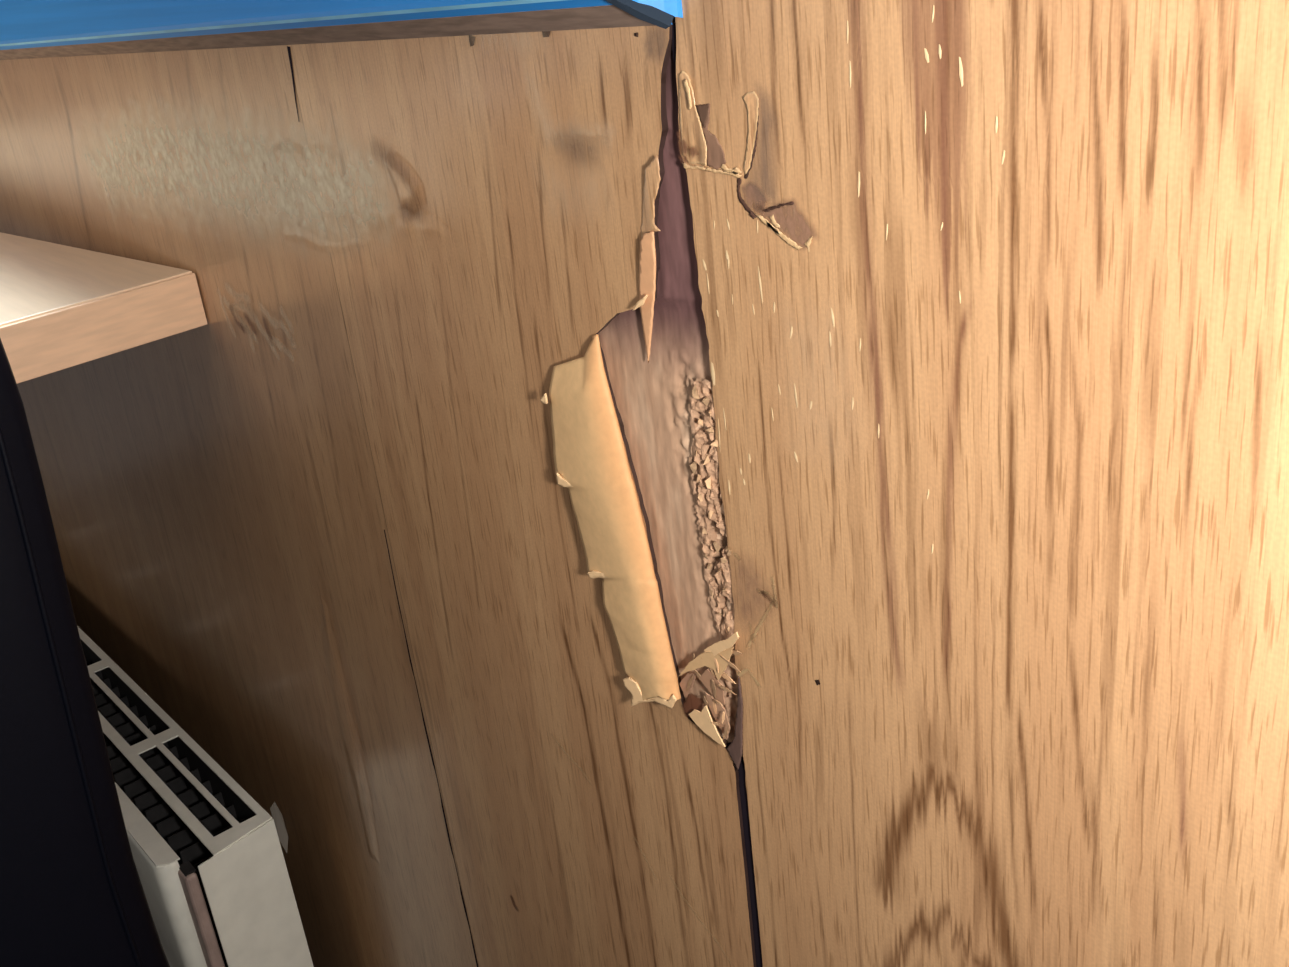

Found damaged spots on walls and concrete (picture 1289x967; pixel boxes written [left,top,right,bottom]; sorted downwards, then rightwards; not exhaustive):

crack [287,46,299,120]
crack [670,24,678,74]
peeling [678,70,726,170]
spalling [679,378,739,747]
crack [384,530,478,967]
crack [727,676,763,967]